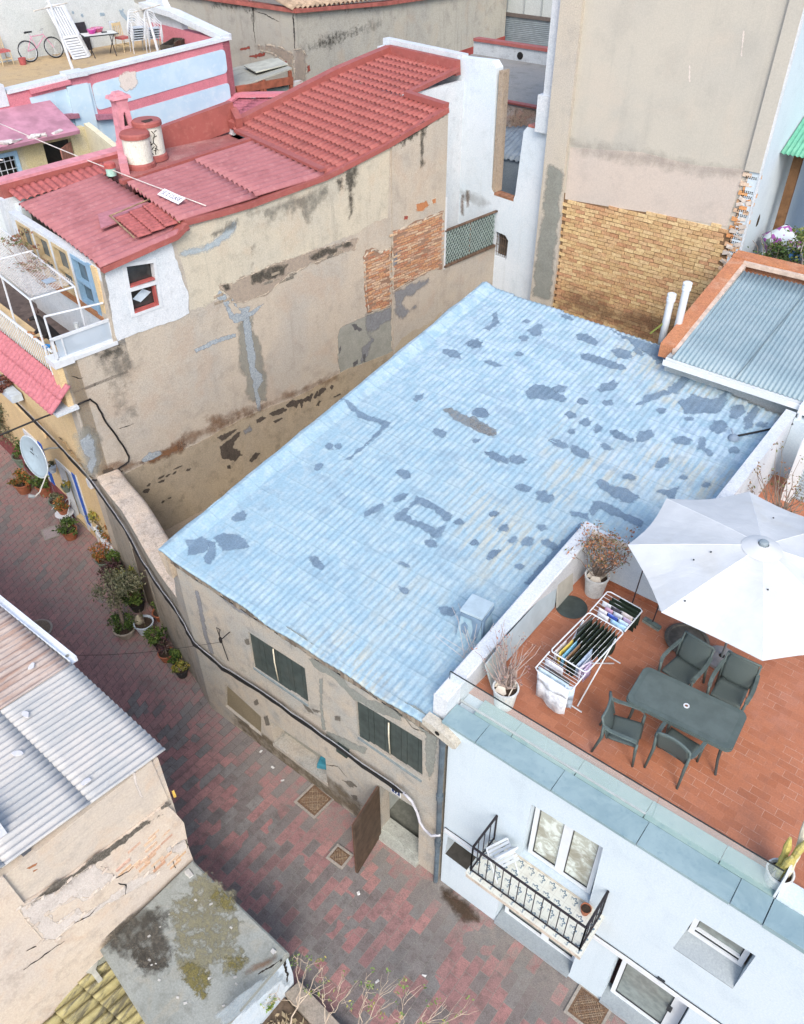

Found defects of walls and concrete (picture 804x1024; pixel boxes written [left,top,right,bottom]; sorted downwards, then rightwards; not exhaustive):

flaking render [214,197,445,313]
spalling [722,176,760,268]
peeling [166,840,187,854]
peeling [15,864,161,946]
leakage [107,907,171,971]